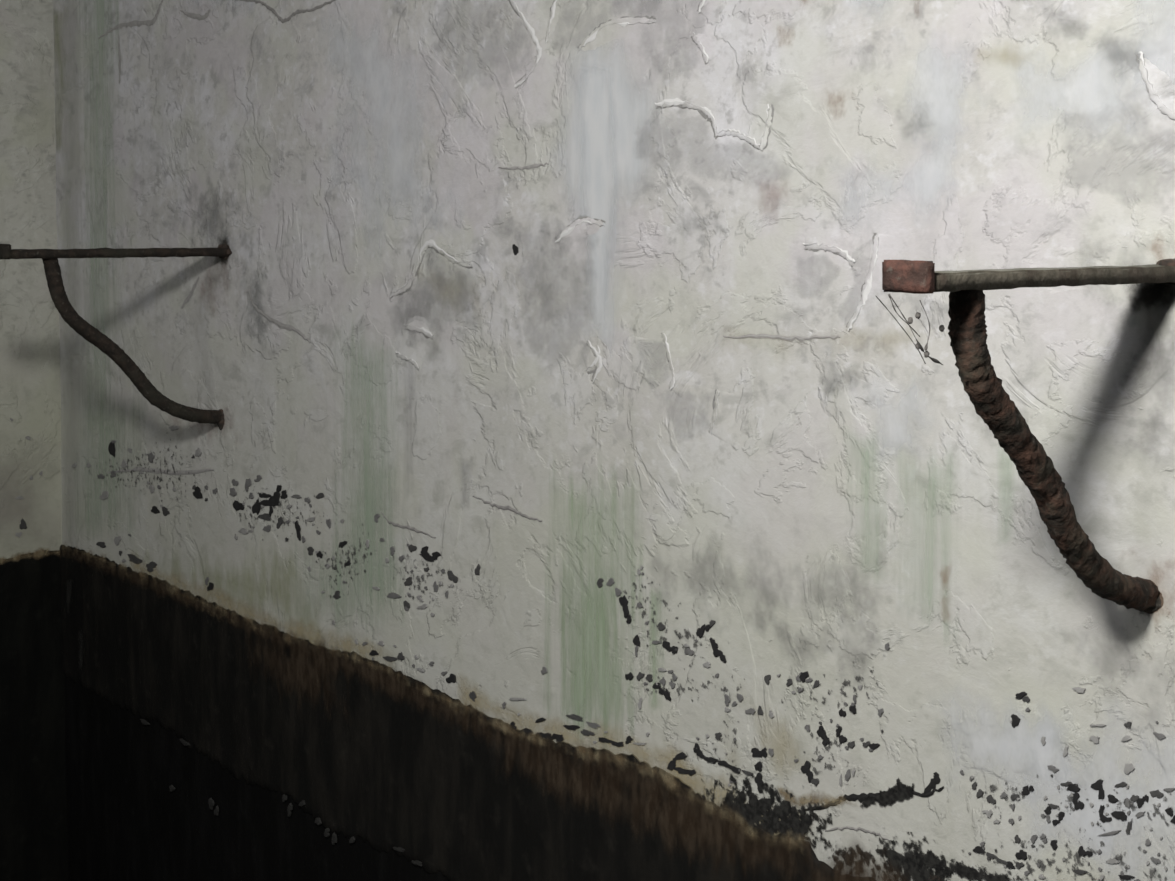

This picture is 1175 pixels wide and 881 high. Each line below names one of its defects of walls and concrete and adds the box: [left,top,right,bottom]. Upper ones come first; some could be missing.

crack [99,0,210,83]
crack [240,0,335,23]
peeling [508,0,571,100]
peeling [691,0,725,64]
peeling [655,76,774,151]
peeling [390,222,473,370]
leakage [76,551,391,673]
leakage [553,726,761,839]